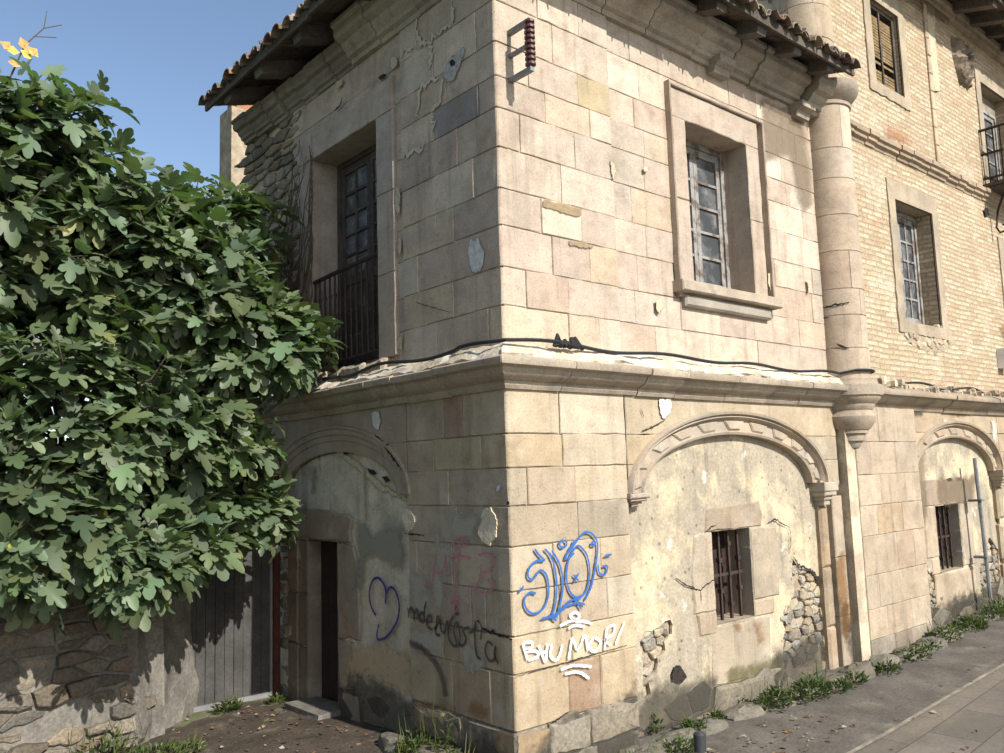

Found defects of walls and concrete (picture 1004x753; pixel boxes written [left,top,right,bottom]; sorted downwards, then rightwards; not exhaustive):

spalling [402,509,416,531]
flaking render [979,543,1001,596]
flaking render [780,564,823,665]
flaking render [640,626,668,687]
damp [338,679,497,753]